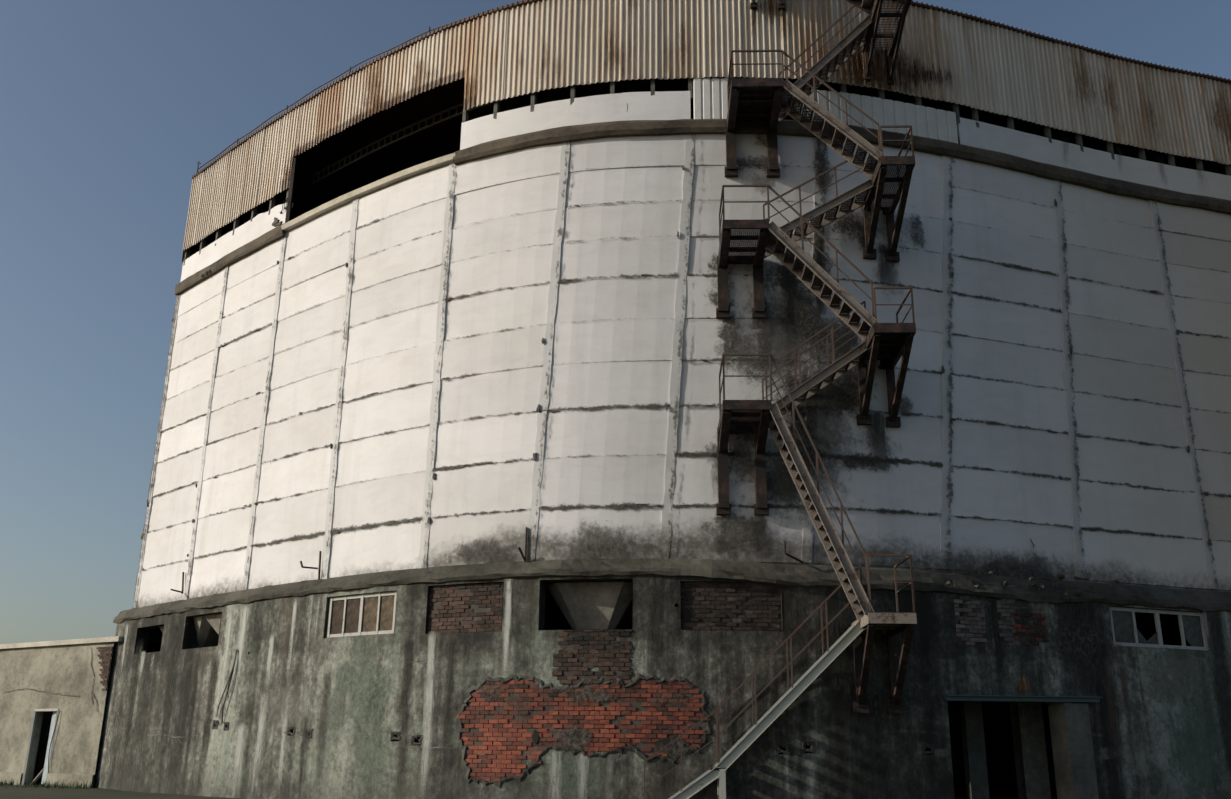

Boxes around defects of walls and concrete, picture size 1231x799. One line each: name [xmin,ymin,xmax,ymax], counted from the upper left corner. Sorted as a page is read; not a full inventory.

damp [708,211,893,397]
damp [785,361,898,482]
peeling [941,156,1017,646]
spalling [1054,183,1081,512]
crack [6,688,79,697]
flaking render [91,646,114,712]
damp [122,626,145,750]
damp [160,607,249,759]
damp [235,697,268,779]
damp [290,601,310,650]
damp [300,677,330,781]
flaking render [456,629,713,789]